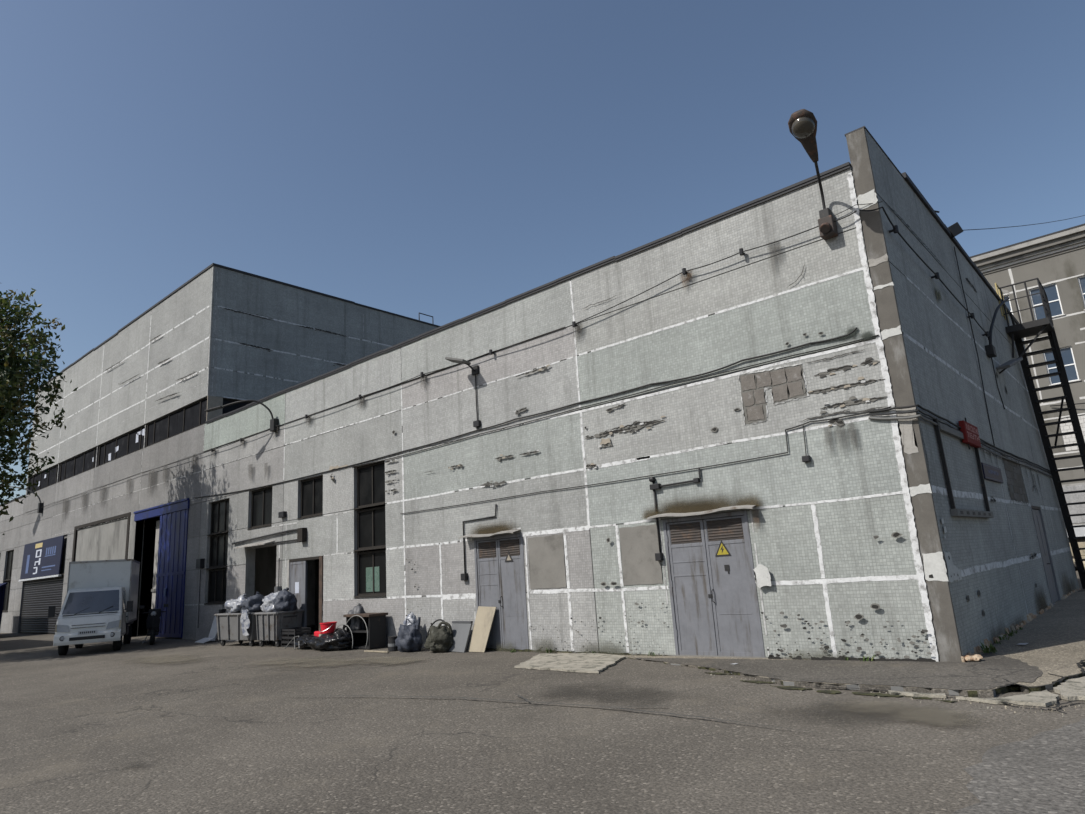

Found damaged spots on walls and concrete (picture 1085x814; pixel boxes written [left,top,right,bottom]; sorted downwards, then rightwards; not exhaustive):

peeling [734,357,886,426]
spalling [584,416,665,448]
peeling [895,407,918,454]
peeling [922,551,962,582]
peeling [761,603,932,659]